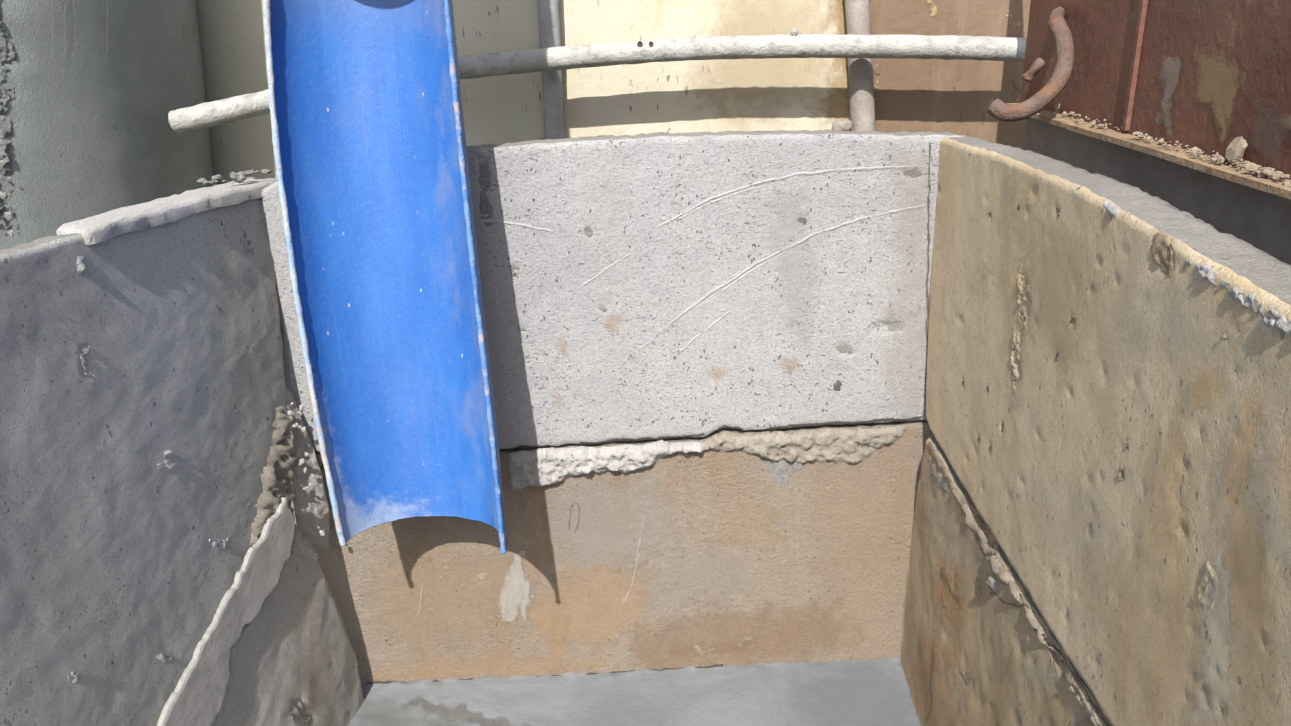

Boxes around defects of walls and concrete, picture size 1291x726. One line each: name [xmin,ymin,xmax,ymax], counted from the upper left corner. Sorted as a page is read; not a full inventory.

spalling [0,0,24,242]
rust [1195,53,1244,140]
crack [924,143,932,379]
spalling [157,450,178,471]
peeling [286,402,307,432]
crack [514,415,926,480]
water stain [500,551,530,622]
crack [924,638,938,726]
crack [989,588,1109,726]